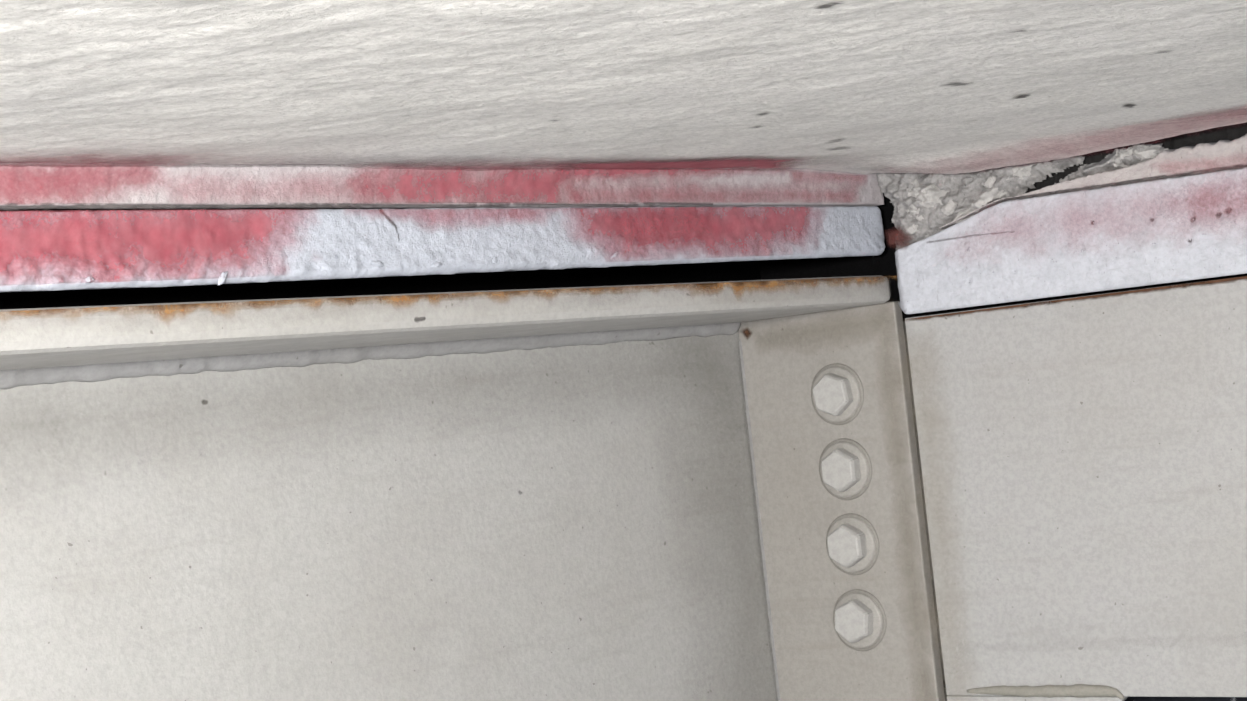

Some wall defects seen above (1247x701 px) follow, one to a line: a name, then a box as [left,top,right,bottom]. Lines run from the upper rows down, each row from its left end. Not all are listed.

spalling [876,155,1085,251]